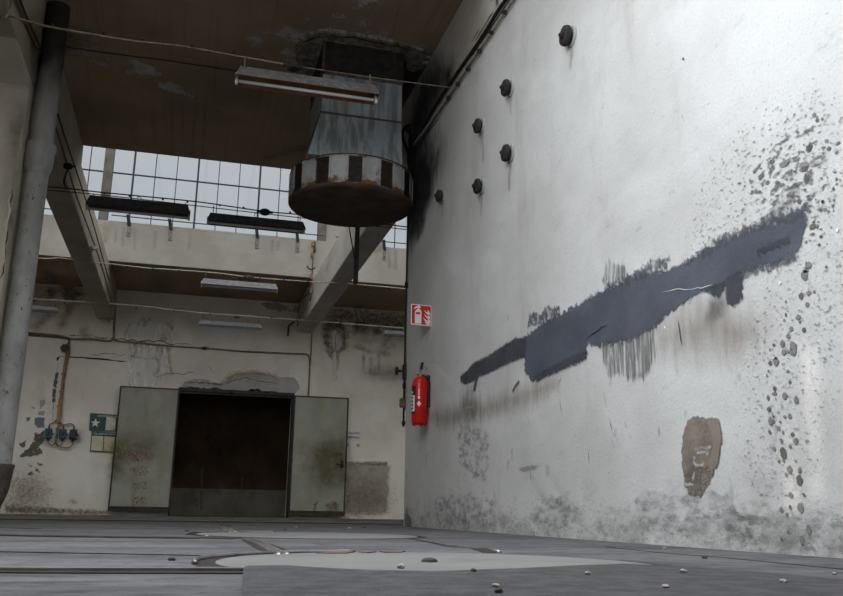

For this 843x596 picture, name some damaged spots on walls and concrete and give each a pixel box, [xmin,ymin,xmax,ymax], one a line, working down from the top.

spalling [280,28,431,76]
damp [693,90,843,272]
peeling [19,369,59,480]
damp [345,462,388,513]
peeling [681,416,722,497]
damp [743,261,843,517]